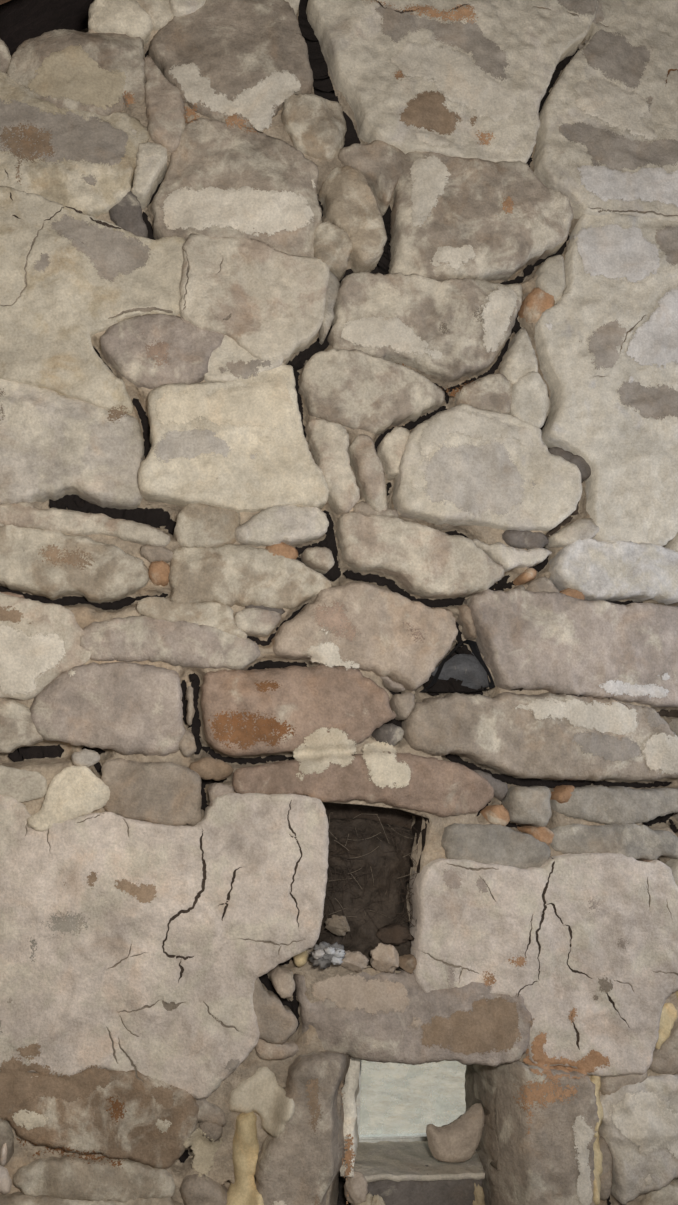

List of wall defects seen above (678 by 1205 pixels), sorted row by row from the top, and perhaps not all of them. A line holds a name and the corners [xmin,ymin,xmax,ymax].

crack [447,863,498,902]
crack [106,800,306,1083]
crack [518,854,678,1027]
crack [423,952,479,979]
crack [571,1015,580,1050]